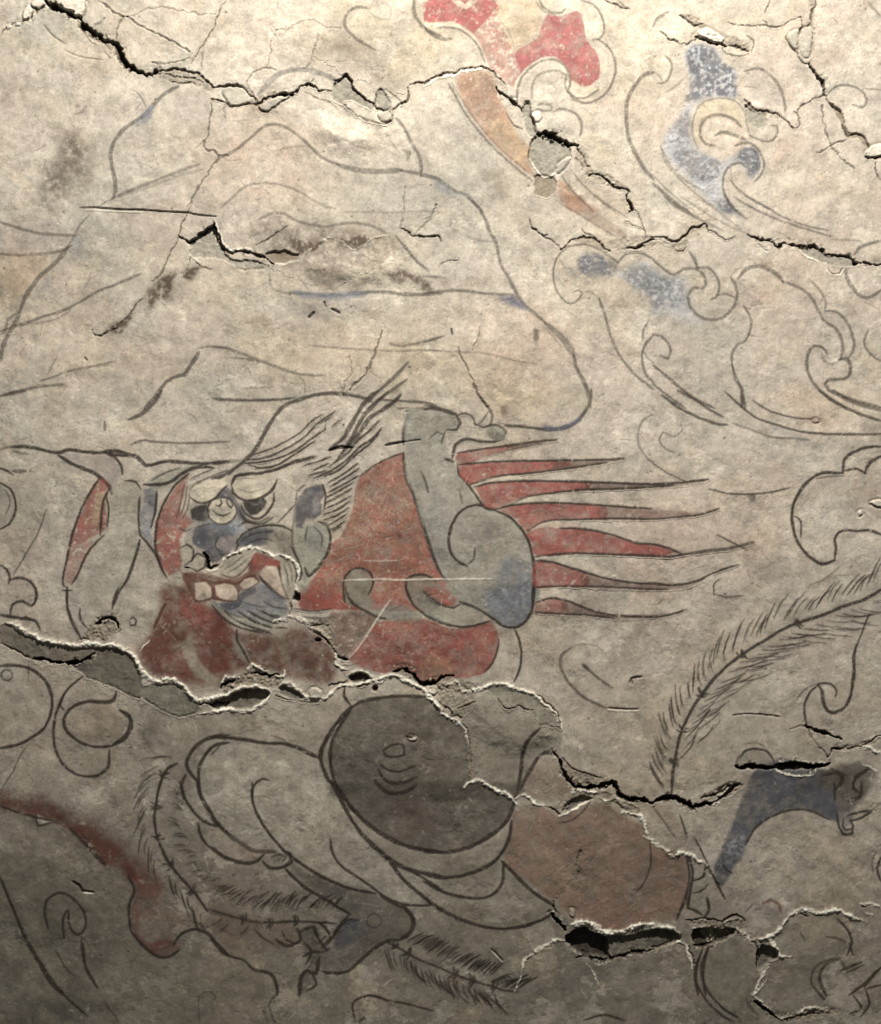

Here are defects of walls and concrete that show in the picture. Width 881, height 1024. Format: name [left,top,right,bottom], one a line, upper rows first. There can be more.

crack [603,0,631,11]
crack [659,0,881,181]
crack [1,0,341,307]
crack [399,65,881,277]
crack [90,329,106,338]
spalling [209,661,286,714]
crack [0,544,881,1024]
spalling [730,755,832,778]
spalling [513,899,748,993]